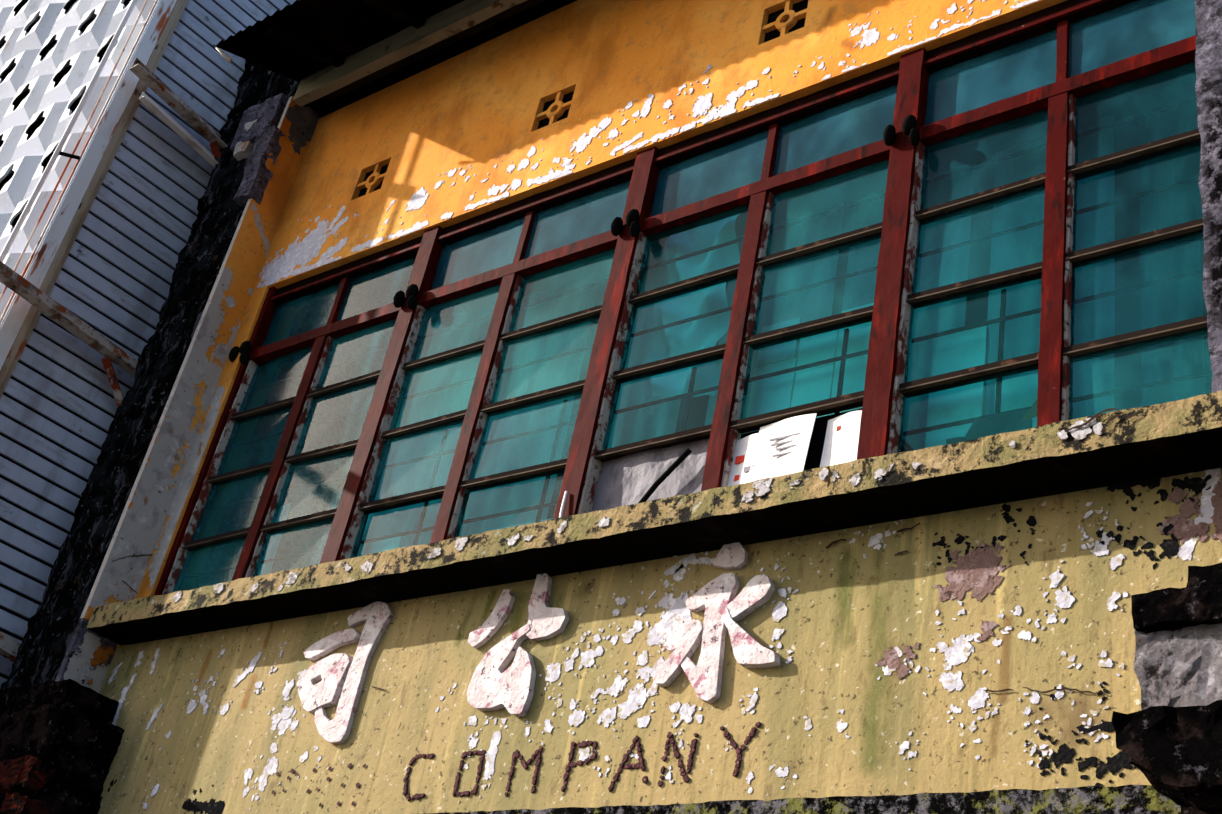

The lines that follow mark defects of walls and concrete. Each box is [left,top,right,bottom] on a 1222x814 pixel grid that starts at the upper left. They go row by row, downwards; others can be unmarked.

peeling [793,0,1039,80]
peeling [89,64,780,608]
peeling [818,463,895,487]
peeling [1078,501,1125,571]
peeling [760,559,799,664]
peeling [1107,591,1128,612]
spalling [875,542,1075,760]
peeling [739,687,758,715]
peeling [769,765,798,789]
peeling [837,709,850,738]
peeling [895,731,925,771]
peeling [1018,650,1125,768]